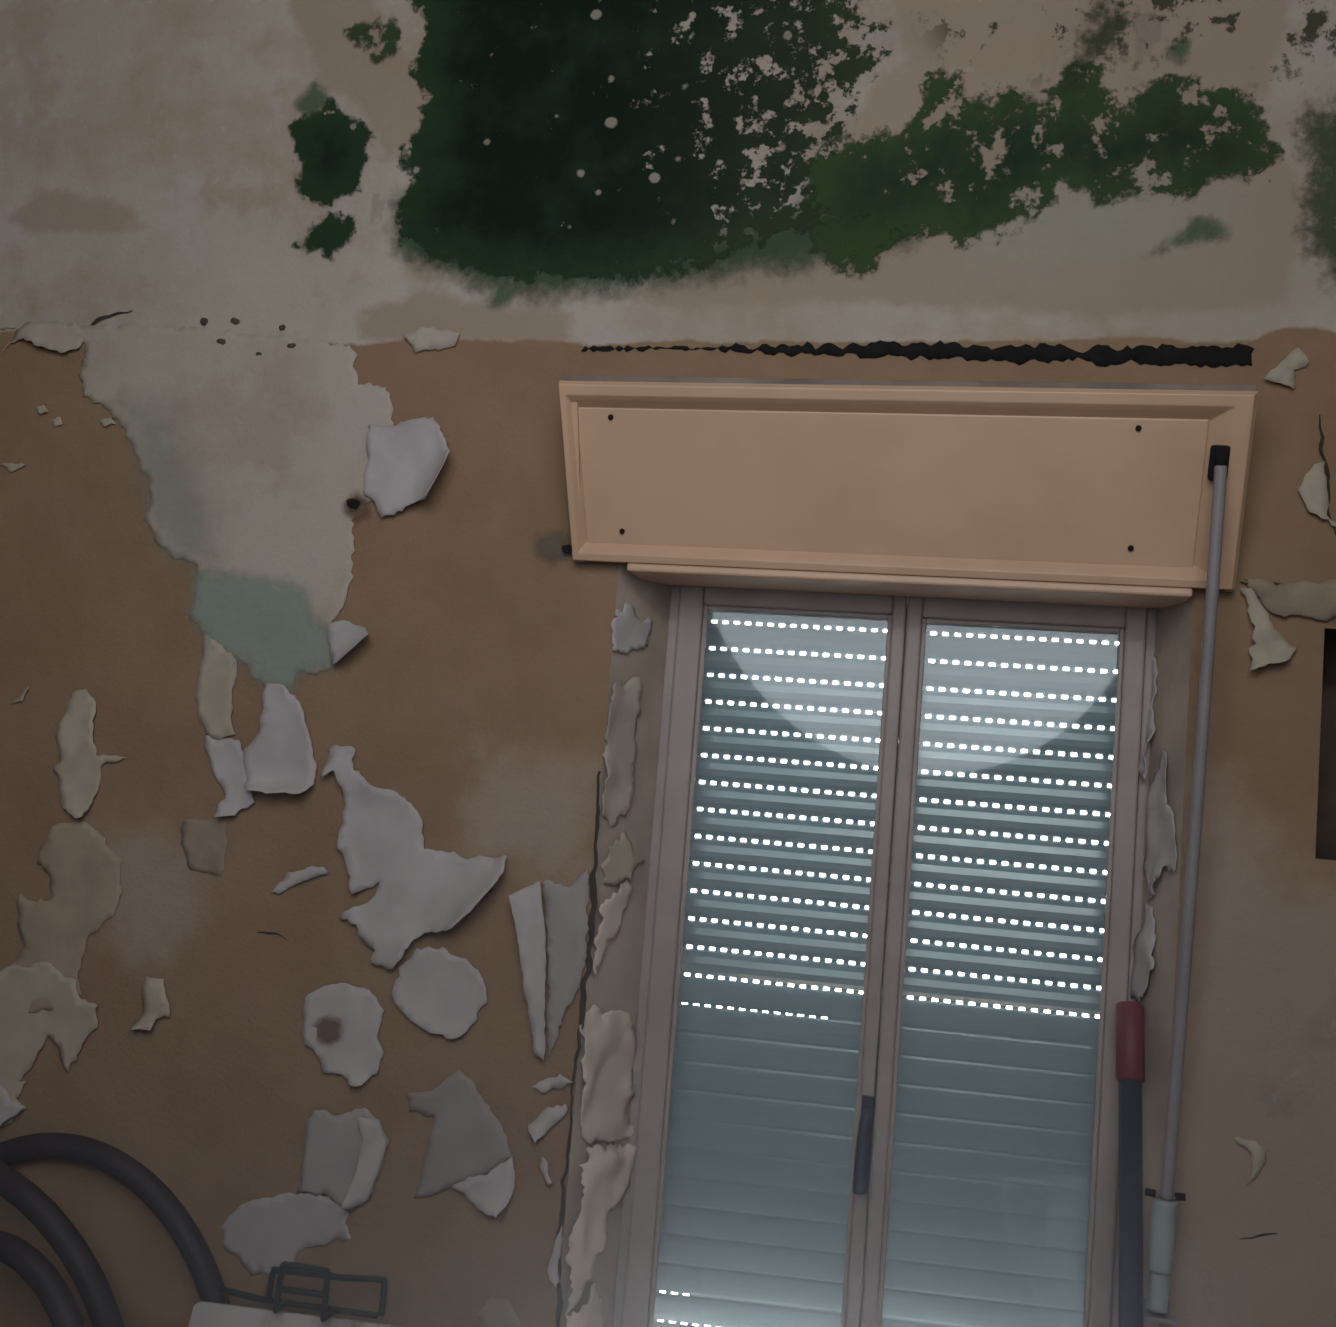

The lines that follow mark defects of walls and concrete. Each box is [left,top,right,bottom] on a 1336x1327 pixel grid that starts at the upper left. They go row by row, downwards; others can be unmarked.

damp [343,17,401,63]
damp [1283,1,1336,64]
damp [288,82,372,260]
damp [395,0,1285,305]
damp [1301,110,1336,273]
crack [581,340,1254,368]
peeling [1241,577,1336,670]
peeling [0,317,645,1127]
crack [554,771,601,1327]
peeling [220,1108,389,1277]
peeling [406,1070,515,1218]
peeling [528,1005,637,1327]